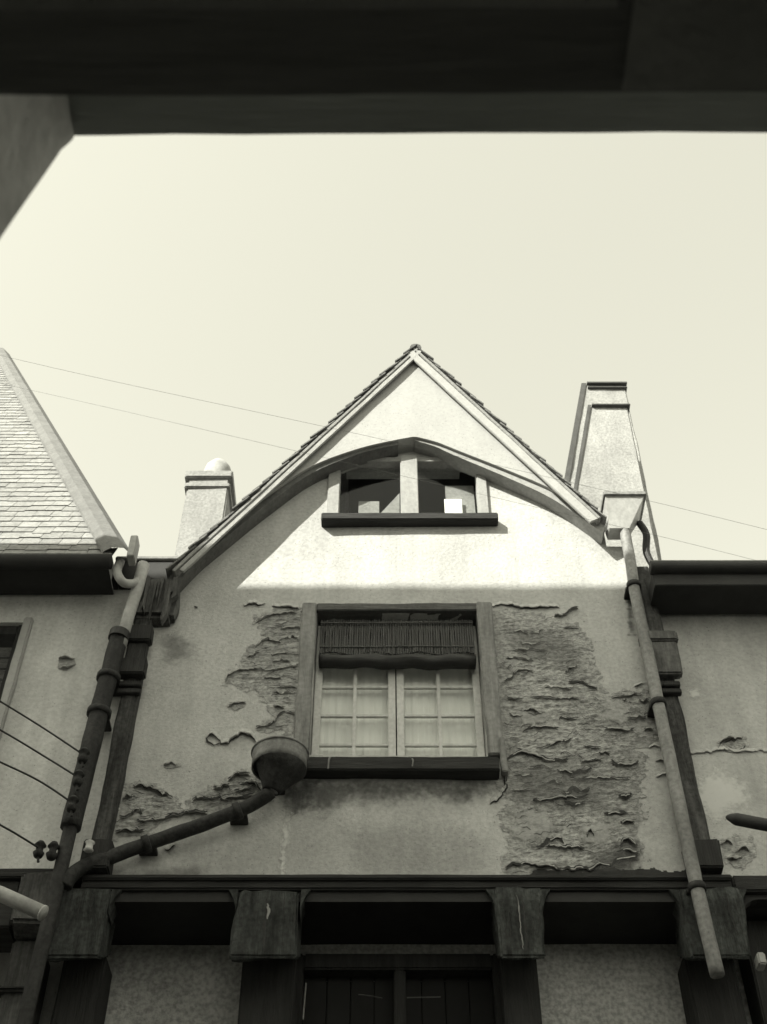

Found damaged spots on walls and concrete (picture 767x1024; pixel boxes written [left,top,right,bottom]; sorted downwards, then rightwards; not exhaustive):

flaking render [58,655,76,670]
flaking render [222,608,302,735]
flaking render [493,606,687,875]
crack [691,738,767,754]
flaking render [717,735,749,753]
flaking render [112,767,263,842]
flaking render [719,834,757,871]